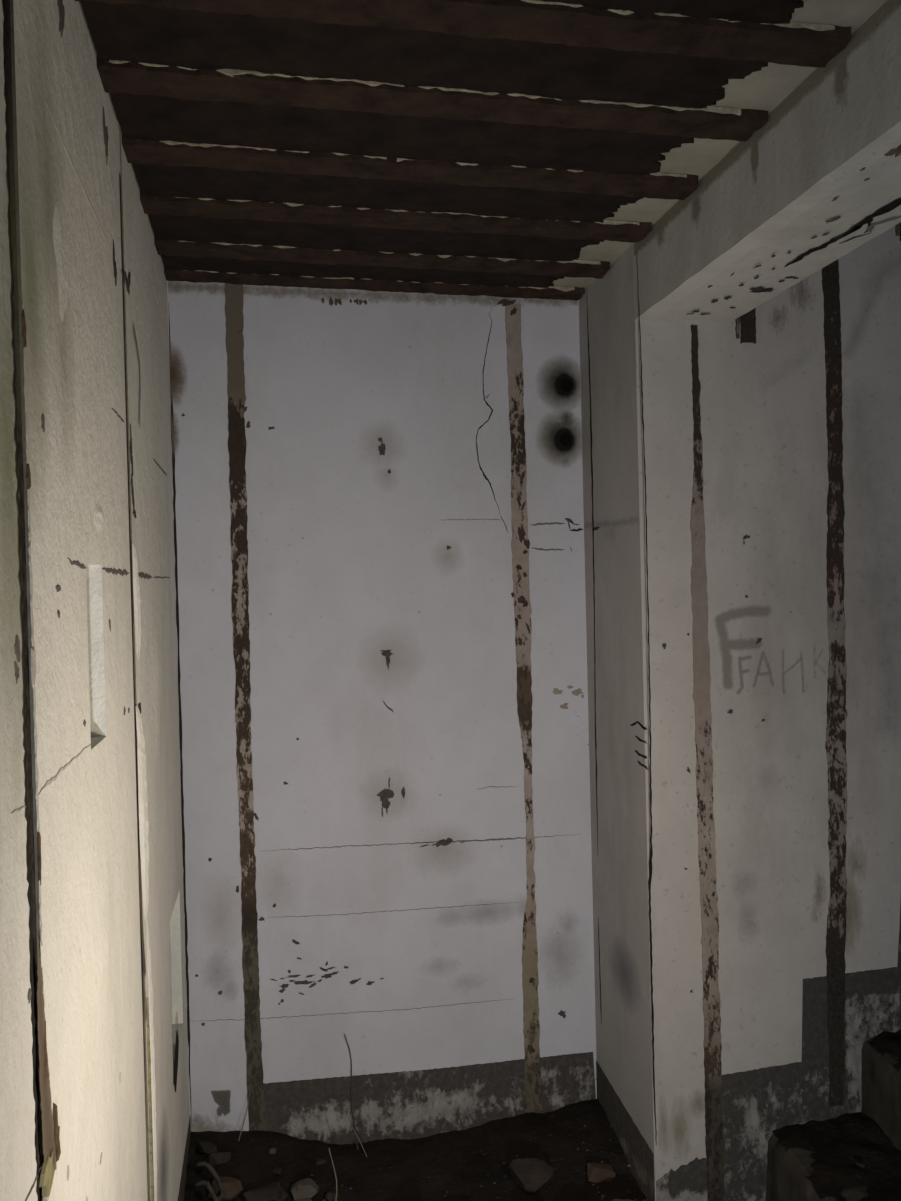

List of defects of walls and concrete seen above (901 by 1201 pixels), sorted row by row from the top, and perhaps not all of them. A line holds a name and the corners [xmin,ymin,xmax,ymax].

peeling [884,145,901,157]
peeling [687,251,798,315]
crack [750,199,901,293]
crack [260,308,600,852]
corrosion [511,592,530,646]
corrosion [516,527,530,577]
crack [630,266,657,1145]
crack [595,923,603,1010]